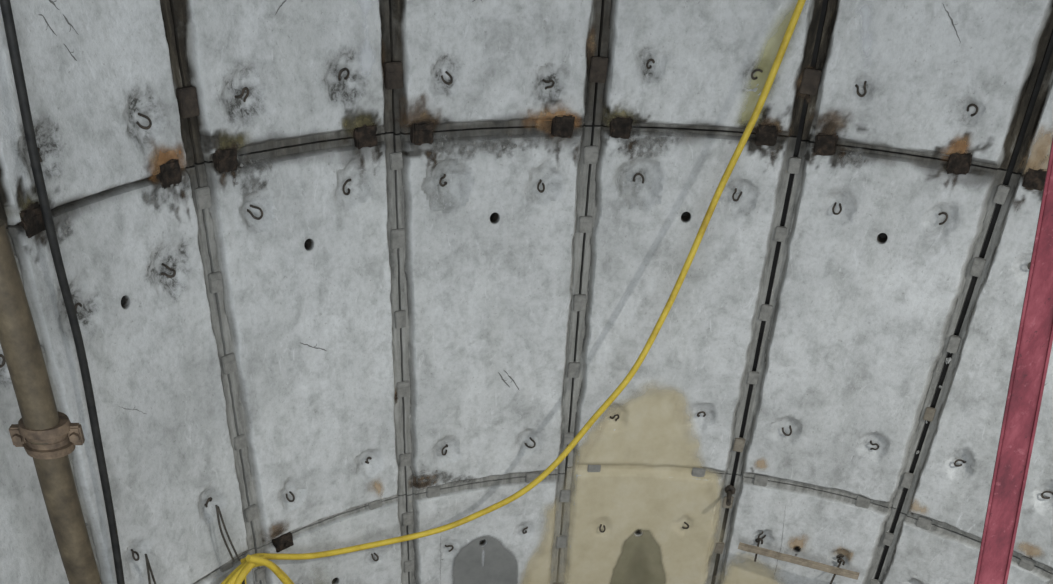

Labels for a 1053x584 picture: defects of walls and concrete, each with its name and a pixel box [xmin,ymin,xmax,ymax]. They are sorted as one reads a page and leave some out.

rust [529,108,579,130]
rust [819,111,843,134]
rust [151,147,183,178]
rust [945,139,968,155]
rust [1024,132,1052,171]
rust [412,475,437,488]
damp [565,390,721,584]
damp [453,505,556,584]
damp [722,560,778,584]